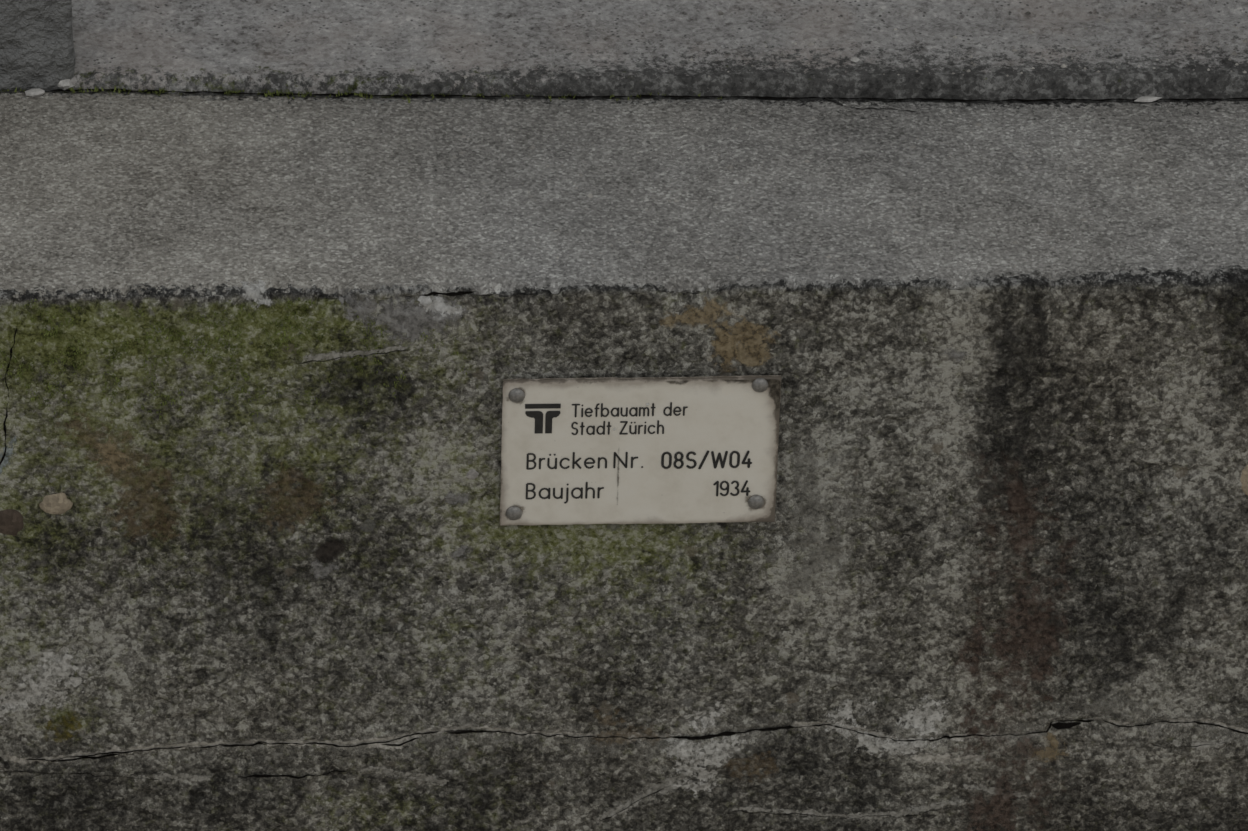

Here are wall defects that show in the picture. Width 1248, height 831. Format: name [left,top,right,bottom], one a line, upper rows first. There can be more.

crack [0,328,17,474]
crack [0,718,1248,786]
crack [596,772,687,823]
crack [731,784,1034,820]